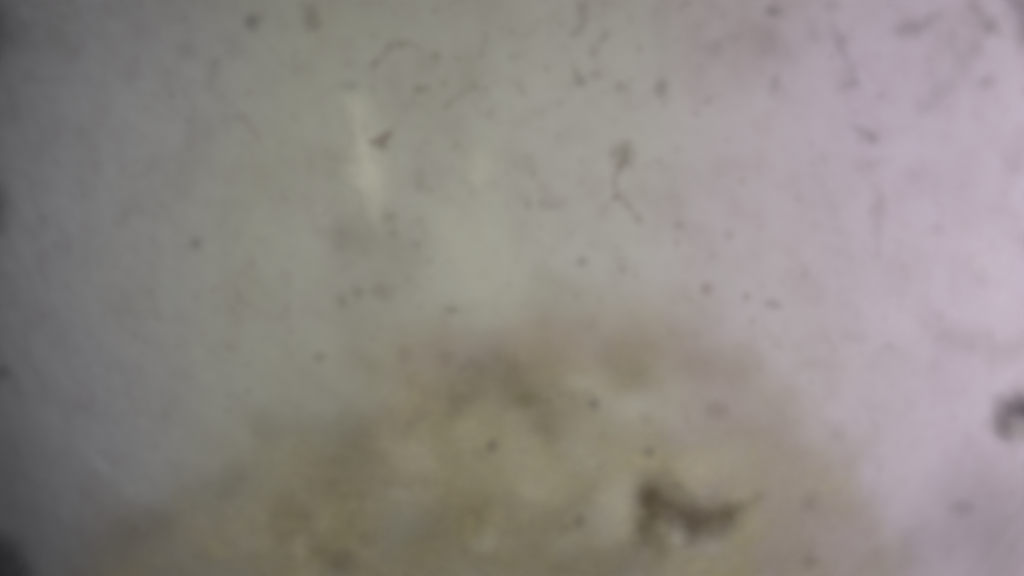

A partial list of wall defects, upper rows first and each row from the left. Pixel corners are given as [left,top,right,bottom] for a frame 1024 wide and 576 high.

leakage [190,341,833,576]